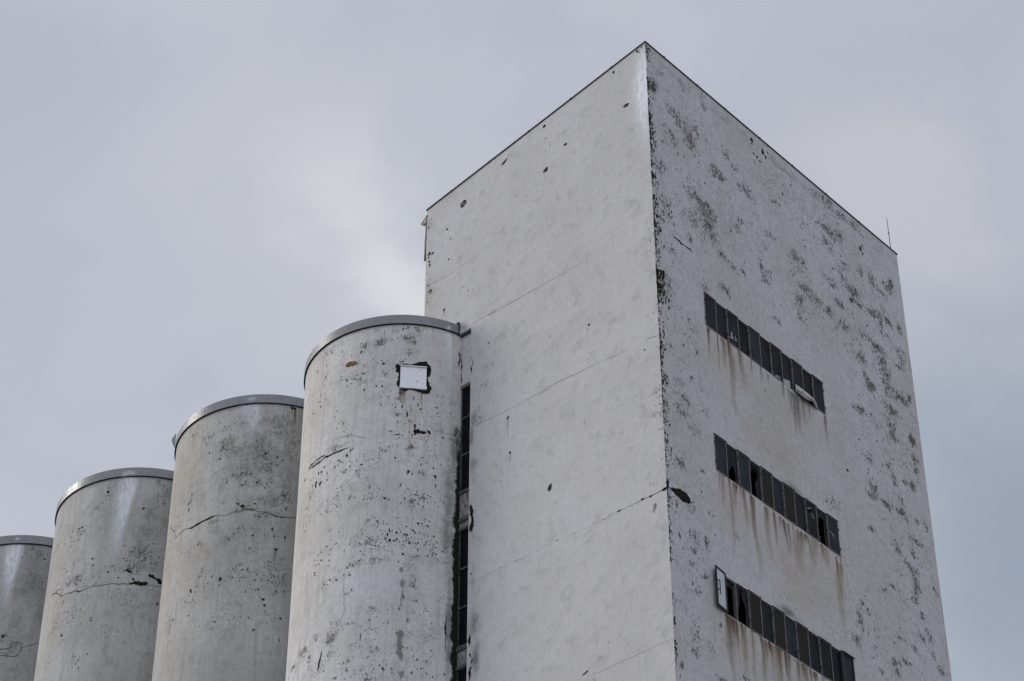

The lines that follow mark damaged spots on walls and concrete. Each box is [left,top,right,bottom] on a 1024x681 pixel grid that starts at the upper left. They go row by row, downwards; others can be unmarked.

crack [308,435,366,471]
crack [172,504,296,537]
spalling [106,341,453,680]
spalling [667,478,693,512]